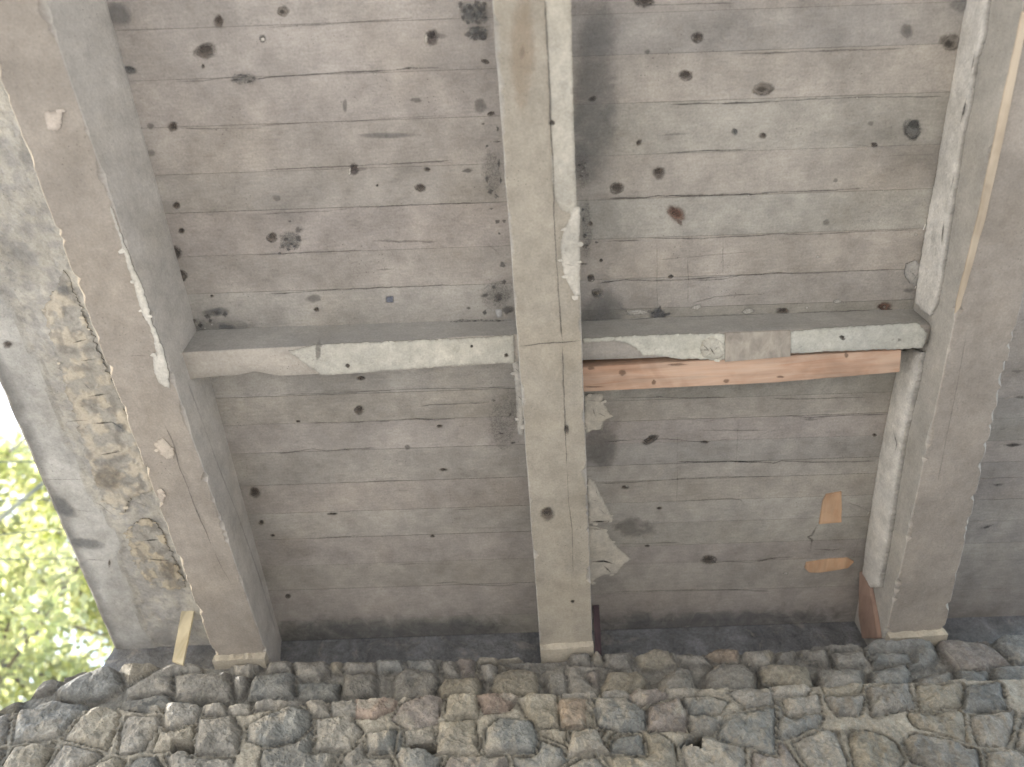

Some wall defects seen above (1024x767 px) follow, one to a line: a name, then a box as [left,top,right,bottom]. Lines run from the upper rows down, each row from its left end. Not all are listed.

peeling [110,206,170,389]
peeling [558,207,598,300]
corrosion [667,207,684,220]
peeling [42,270,186,590]
peeling [584,393,613,434]
peeling [587,478,630,585]